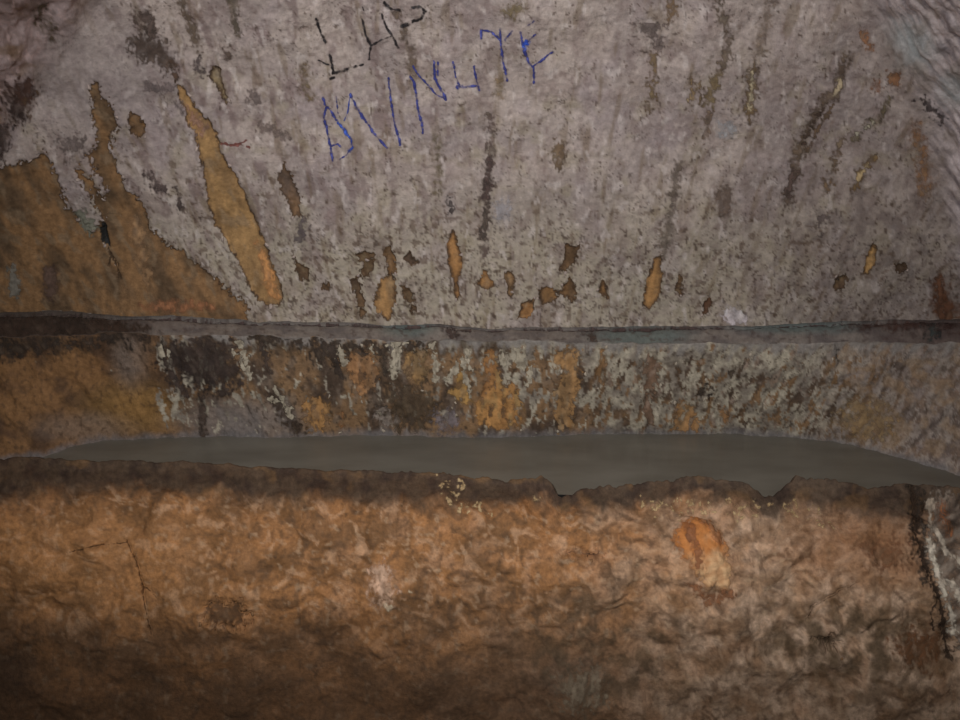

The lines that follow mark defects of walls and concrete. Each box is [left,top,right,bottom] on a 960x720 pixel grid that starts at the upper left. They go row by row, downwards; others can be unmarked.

flaking render [209,65,231,104]
damp [782,53,852,208]
damp [823,95,891,194]
flaking render [0,81,283,320]
flaking render [350,246,420,321]
flaking render [447,230,463,302]
flaking render [477,243,580,319]
flaking render [597,280,609,299]
flaking render [642,254,664,309]
damp [0,313,459,437]
damp [905,484,931,585]
crack [72,540,154,629]